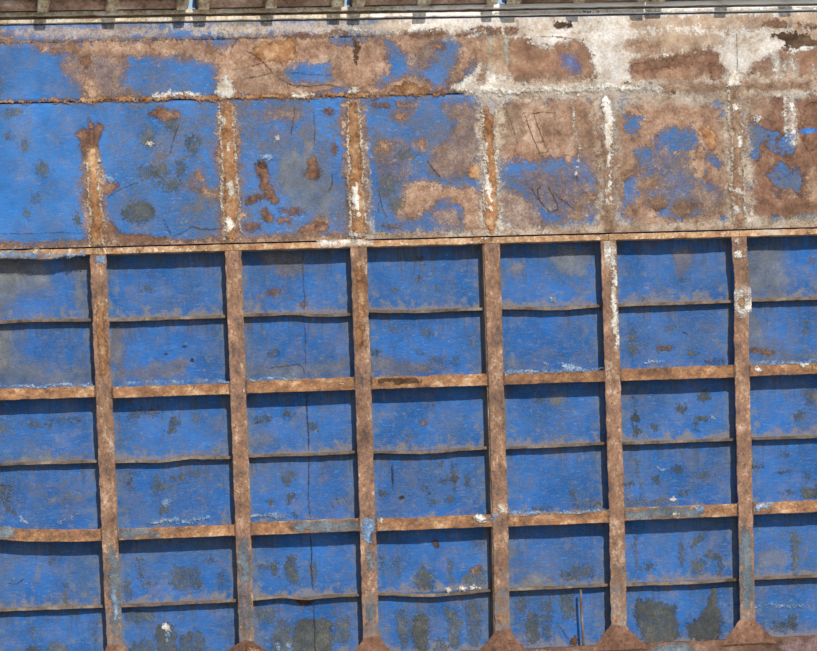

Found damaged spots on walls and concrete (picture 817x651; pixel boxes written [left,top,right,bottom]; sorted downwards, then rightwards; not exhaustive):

corrosion [0,18,817,249]
water stain [0,6,817,364]
corrosion [96,299,108,380]
corrosion [354,259,366,349]
water stain [371,341,460,375]
corrosion [26,626,72,651]
water stain [255,606,351,651]
water stain [394,558,489,651]
water stain [633,587,724,643]